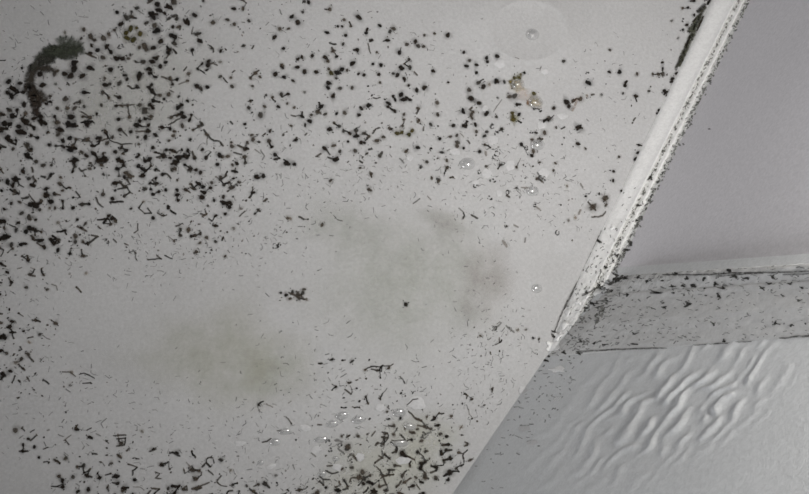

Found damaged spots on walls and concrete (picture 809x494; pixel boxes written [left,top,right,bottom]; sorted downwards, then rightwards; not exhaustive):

water stain [0,0,587,296]
water stain [517,0,809,439]
water stain [0,307,62,405]
water stain [279,288,308,301]
water stain [466,316,540,368]
water stain [13,359,502,494]